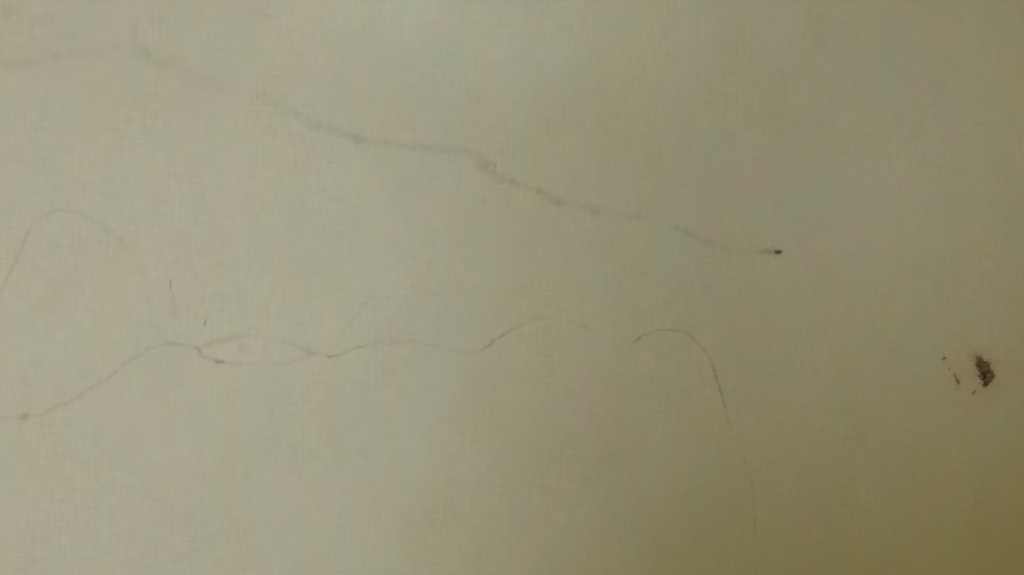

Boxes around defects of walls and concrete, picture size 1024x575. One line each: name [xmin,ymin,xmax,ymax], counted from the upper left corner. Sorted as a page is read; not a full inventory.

spalling [976,356,995,387]